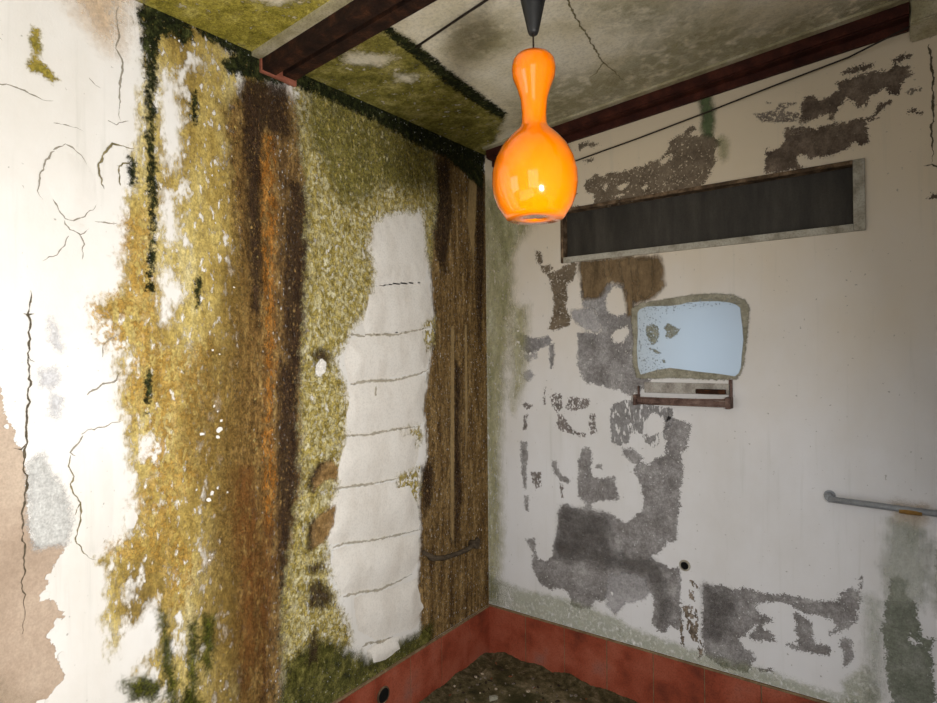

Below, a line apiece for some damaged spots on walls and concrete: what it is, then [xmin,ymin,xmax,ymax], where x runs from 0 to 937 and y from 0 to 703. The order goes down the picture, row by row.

crack [37,7,135,260]
leakage [496,204,528,255]
crack [567,0,621,79]
peeling [755,51,922,174]
crack [926,45,937,167]
crack [15,290,34,634]
spalling [0,380,72,703]
leakage [92,80,314,703]
corrosion [239,134,278,659]
leakage [396,150,489,640]
peeling [514,250,863,674]
peeling [879,576,937,703]